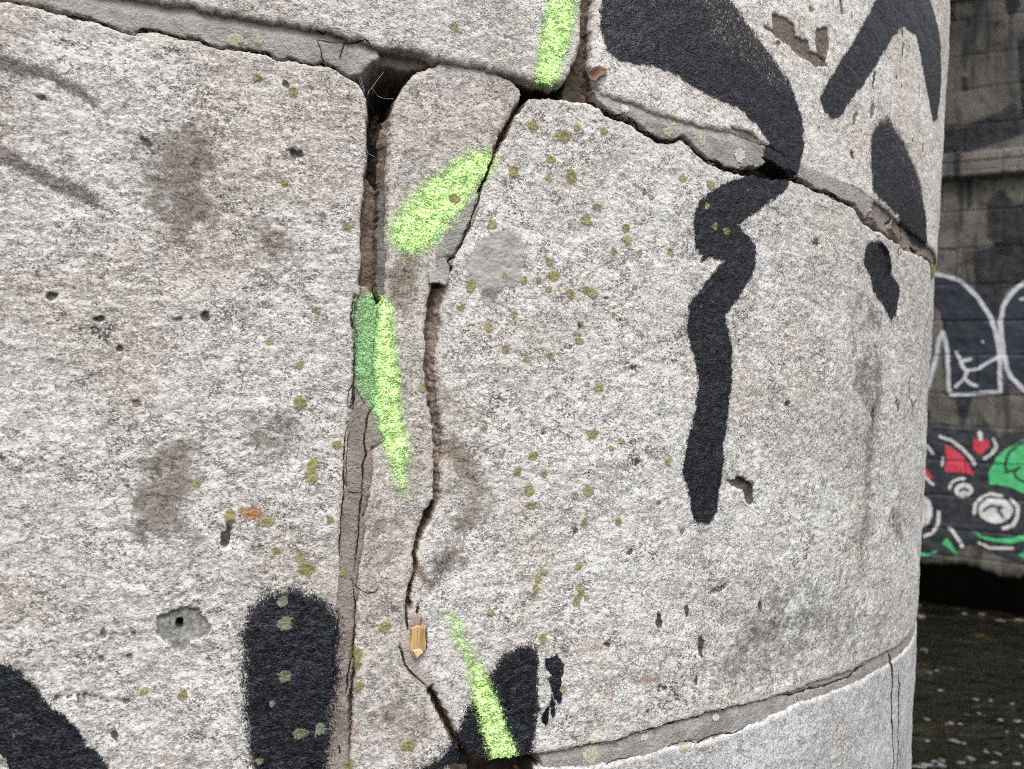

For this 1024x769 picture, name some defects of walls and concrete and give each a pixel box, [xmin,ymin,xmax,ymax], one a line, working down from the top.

spalling [763,14,829,67]
crack [587,102,915,254]
crack [399,98,527,769]
rust [240,507,259,519]
crack [331,296,378,697]
spalling [726,476,754,504]
crack [573,660,869,765]